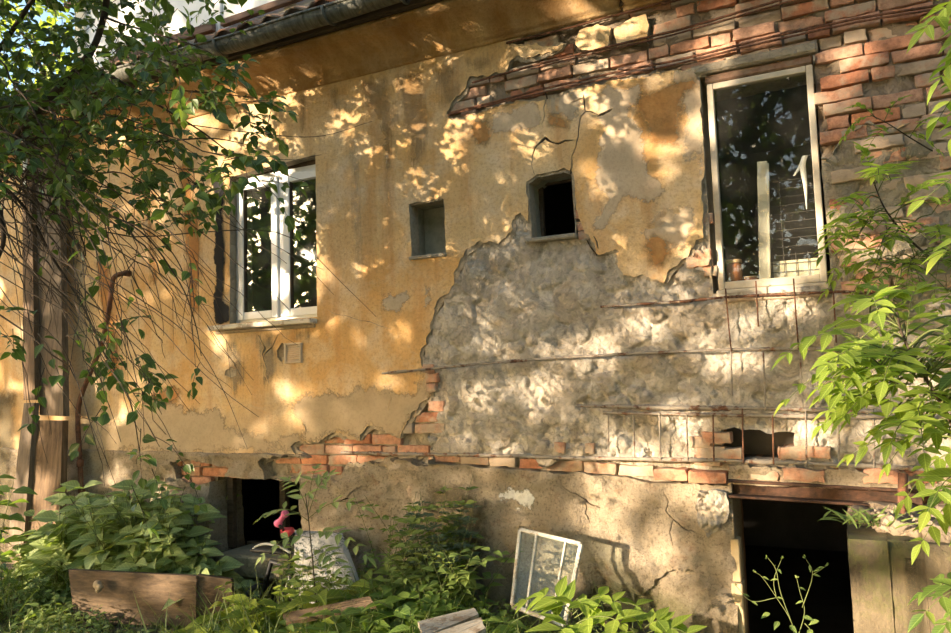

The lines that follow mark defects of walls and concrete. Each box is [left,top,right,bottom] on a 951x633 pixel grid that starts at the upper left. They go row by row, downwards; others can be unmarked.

flaking render [84,0,951,485]
crack [534,98,611,174]